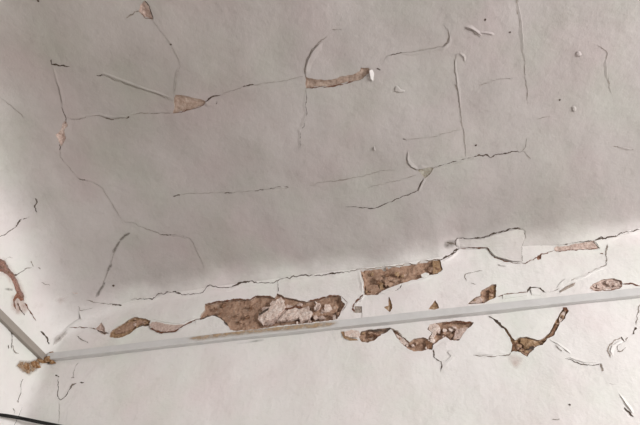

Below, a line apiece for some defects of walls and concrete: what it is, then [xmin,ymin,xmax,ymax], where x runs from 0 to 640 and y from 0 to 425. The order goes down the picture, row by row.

crack [384,25,494,152]
flaking render [0,259,35,319]
flaking render [54,294,345,345]
crack [79,257,357,311]
flaking render [350,259,443,312]
flaking render [341,320,473,369]
crack [440,227,552,266]
flaking render [468,284,546,304]
flaking render [474,307,569,357]
crack [550,305,640,417]
crack [555,229,640,292]
crack [55,363,84,418]